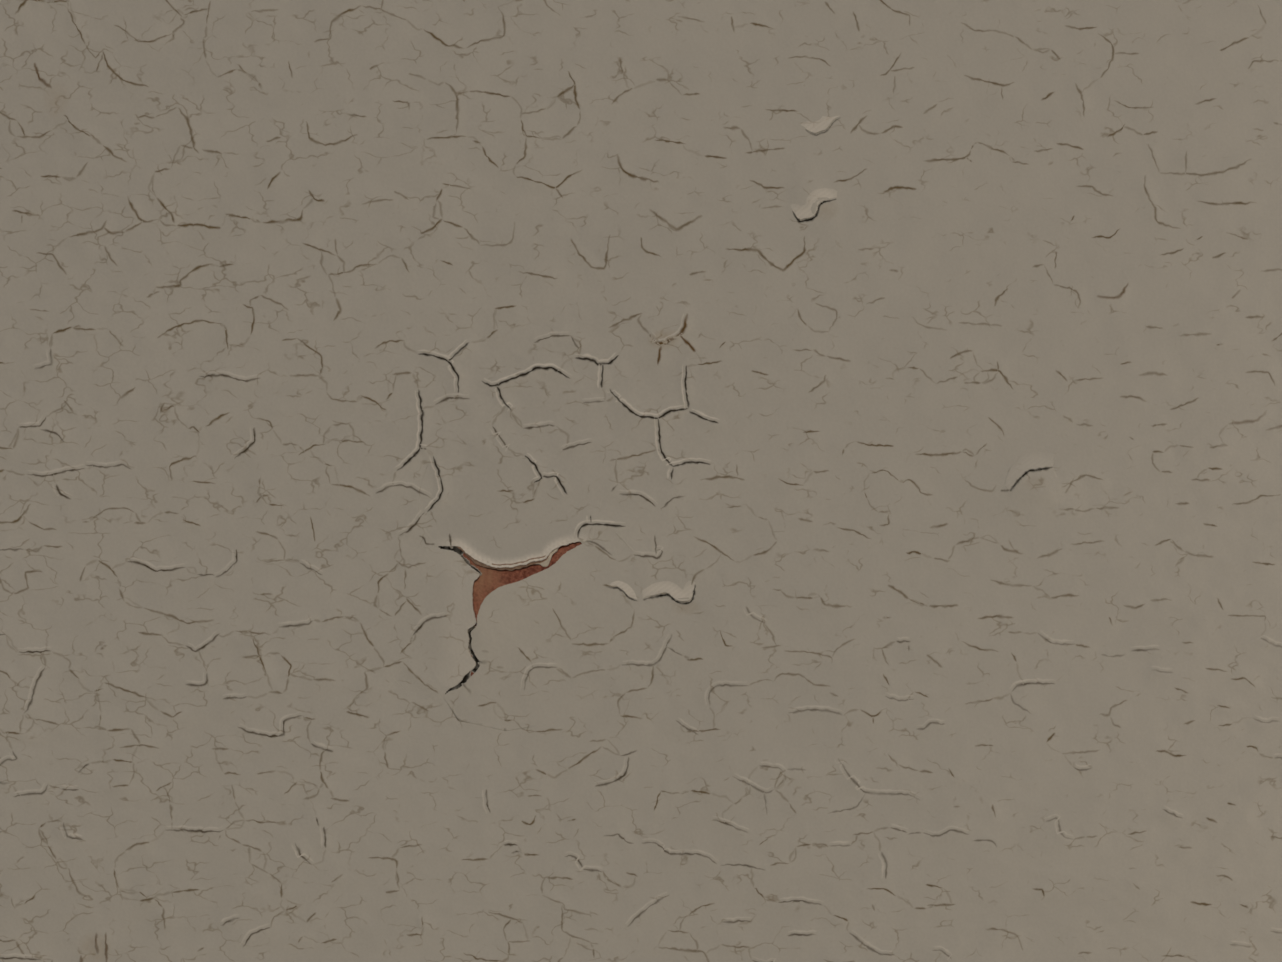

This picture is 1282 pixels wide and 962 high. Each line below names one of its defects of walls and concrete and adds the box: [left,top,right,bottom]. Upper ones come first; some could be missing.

crack [677,16,773,34]
crack [787,55,831,67]
crack [824,0,915,94]
crack [1219,4,1282,70]
crack [0,0,703,321]
crack [655,109,798,209]
crack [833,22,1257,259]
crack [689,236,807,276]
peeling [416,503,704,731]
crack [0,248,1282,962]